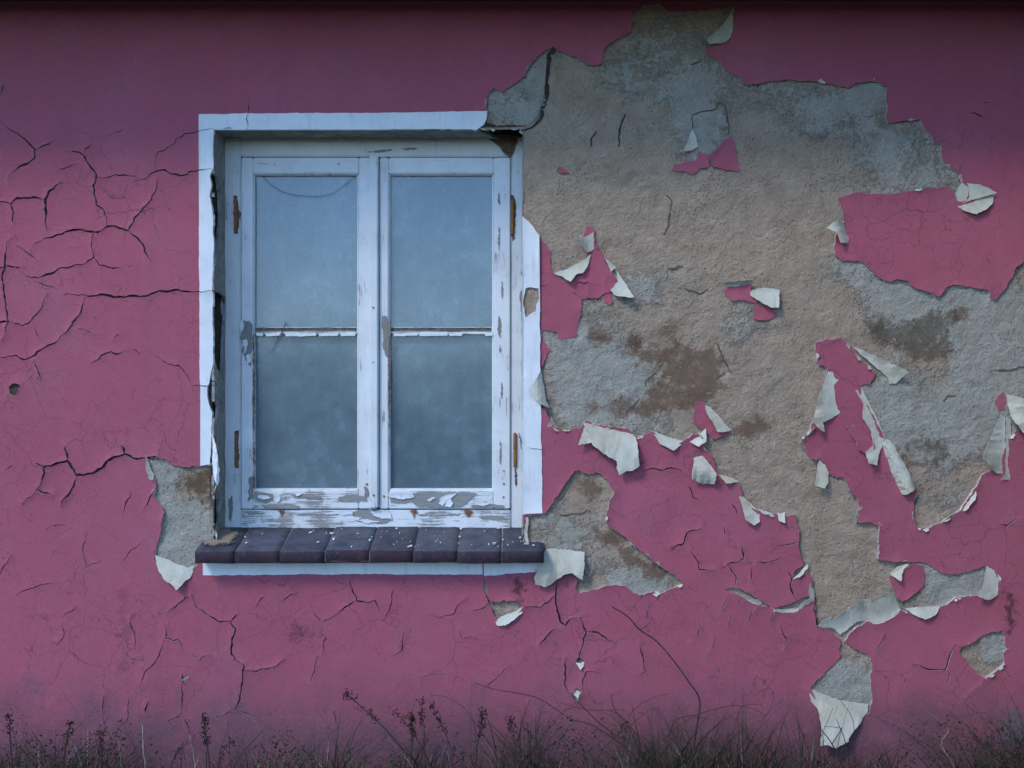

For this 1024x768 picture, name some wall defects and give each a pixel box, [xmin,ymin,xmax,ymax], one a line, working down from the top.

crack [0,121,214,388]
peeling [480,5,1024,748]
peeling [145,316,507,590]
crack [102,592,298,734]
crack [310,583,404,681]
crack [429,601,487,640]
crack [531,580,613,690]
crack [674,504,819,655]